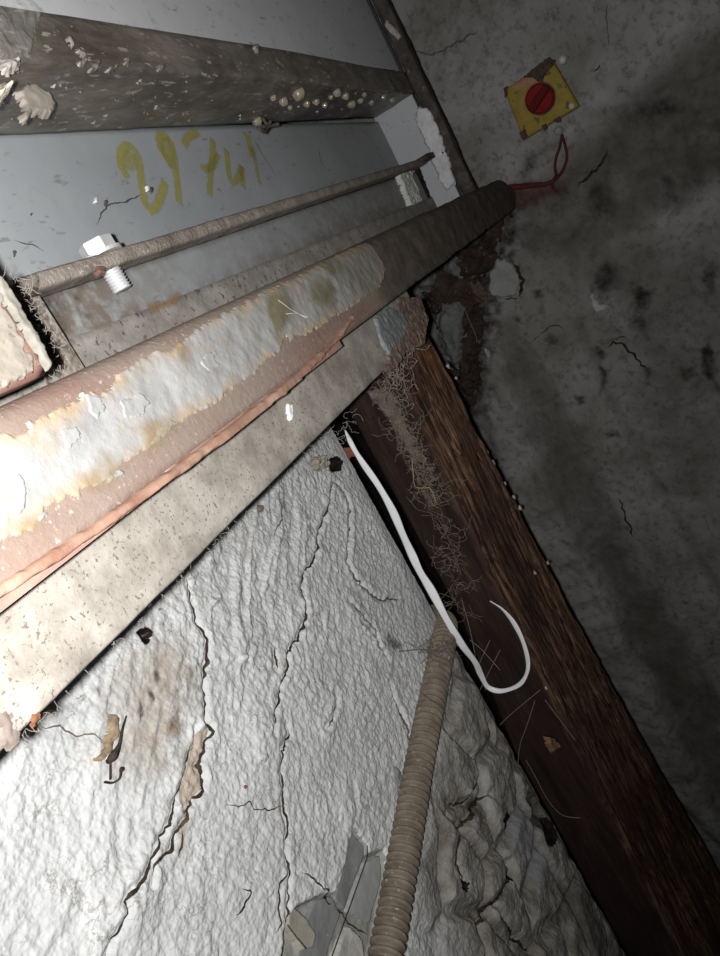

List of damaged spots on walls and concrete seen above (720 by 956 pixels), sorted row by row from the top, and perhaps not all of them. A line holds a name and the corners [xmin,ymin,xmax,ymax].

crack [414,30,479,56]
peeling [488,257,525,300]
crack [608,336,646,369]
peeling [0,243,386,547]
crack [618,498,633,535]
crack [230,483,398,956]
crack [390,685,410,741]
crack [105,579,215,951]
crack [446,783,489,880]